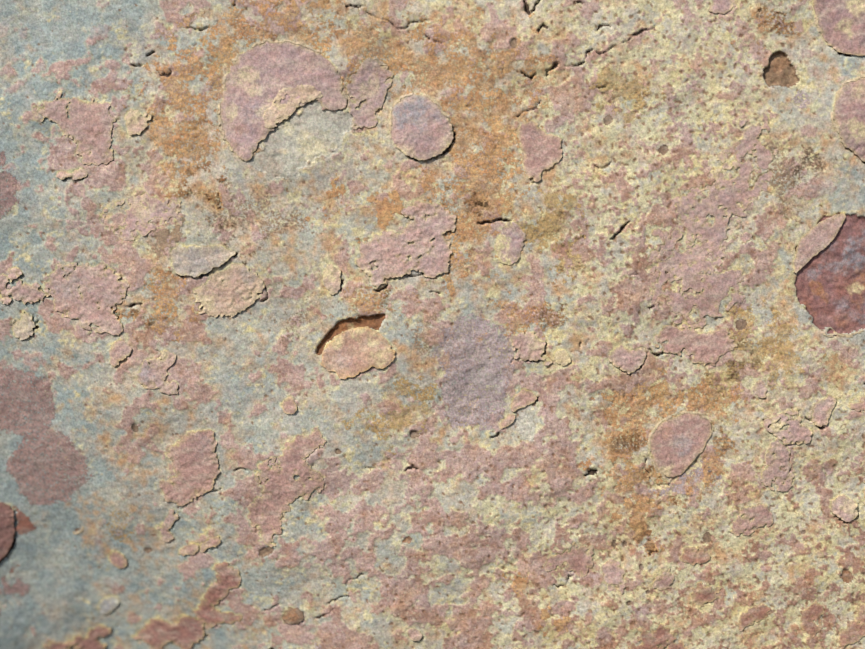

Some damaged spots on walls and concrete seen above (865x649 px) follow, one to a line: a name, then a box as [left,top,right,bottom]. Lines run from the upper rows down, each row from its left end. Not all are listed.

peeling [217,38,456,181]
spalling [763,51,800,88]
peeling [813,0,865,56]
peeling [831,75,865,164]
rust [125,0,594,339]
rust [111,215,203,344]
rust [340,284,440,356]
spalling [793,212,865,338]
peeling [0,502,16,563]